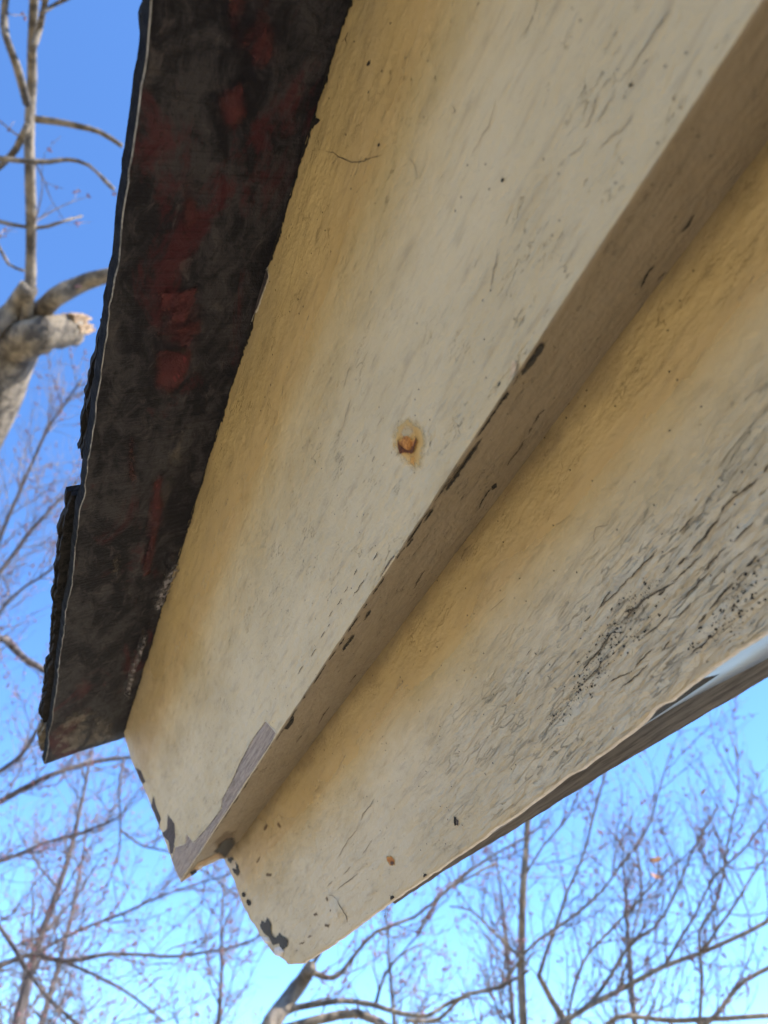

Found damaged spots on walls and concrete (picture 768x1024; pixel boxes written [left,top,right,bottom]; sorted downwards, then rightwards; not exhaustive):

rust [393,419,424,466]
spalling [314,343,545,683]
damp [259,141,768,830]
peeling [151,710,296,882]
spalling [260,918,288,956]